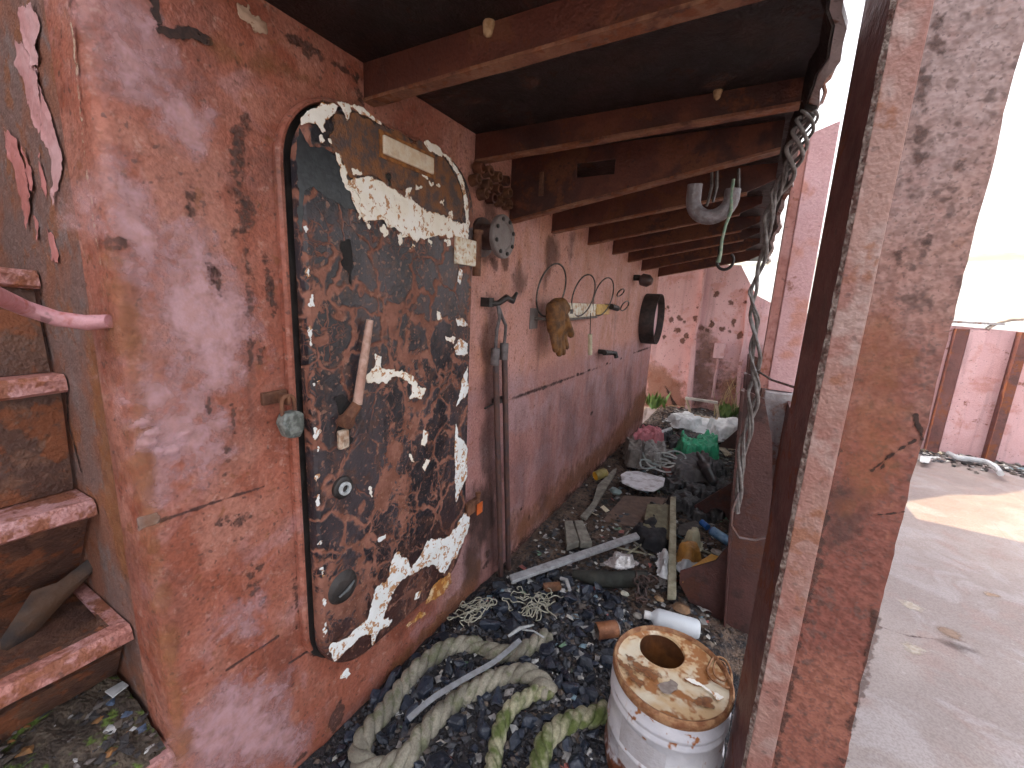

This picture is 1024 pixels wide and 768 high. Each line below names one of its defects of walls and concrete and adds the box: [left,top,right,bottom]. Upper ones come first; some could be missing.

peeling [4,2,63,263]
rust [286,33,464,223]
peeling [300,101,470,249]
peeling [445,318,469,407]
rust [93,349,125,576]
peeling [454,425,468,502]
crack [870,413,924,472]
rust [0,559,93,650]
peeling [312,513,470,679]
rust [389,556,480,674]